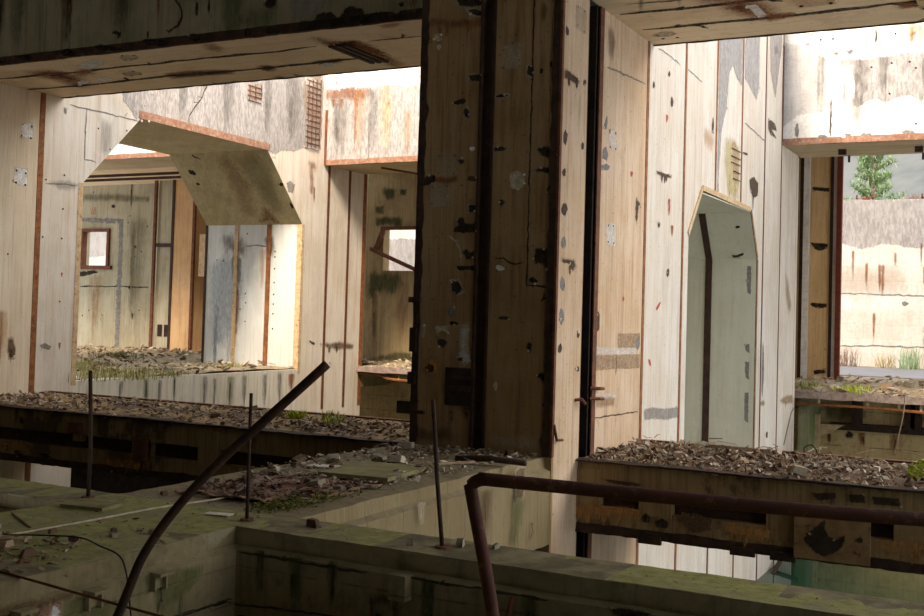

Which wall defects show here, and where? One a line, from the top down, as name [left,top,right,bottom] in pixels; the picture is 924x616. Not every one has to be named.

rust [319,39,399,66]
peeling [833,49,924,107]
peeling [123,59,420,160]
rust [327,89,362,106]
spalling [804,520,845,557]
crack [158,587,333,616]